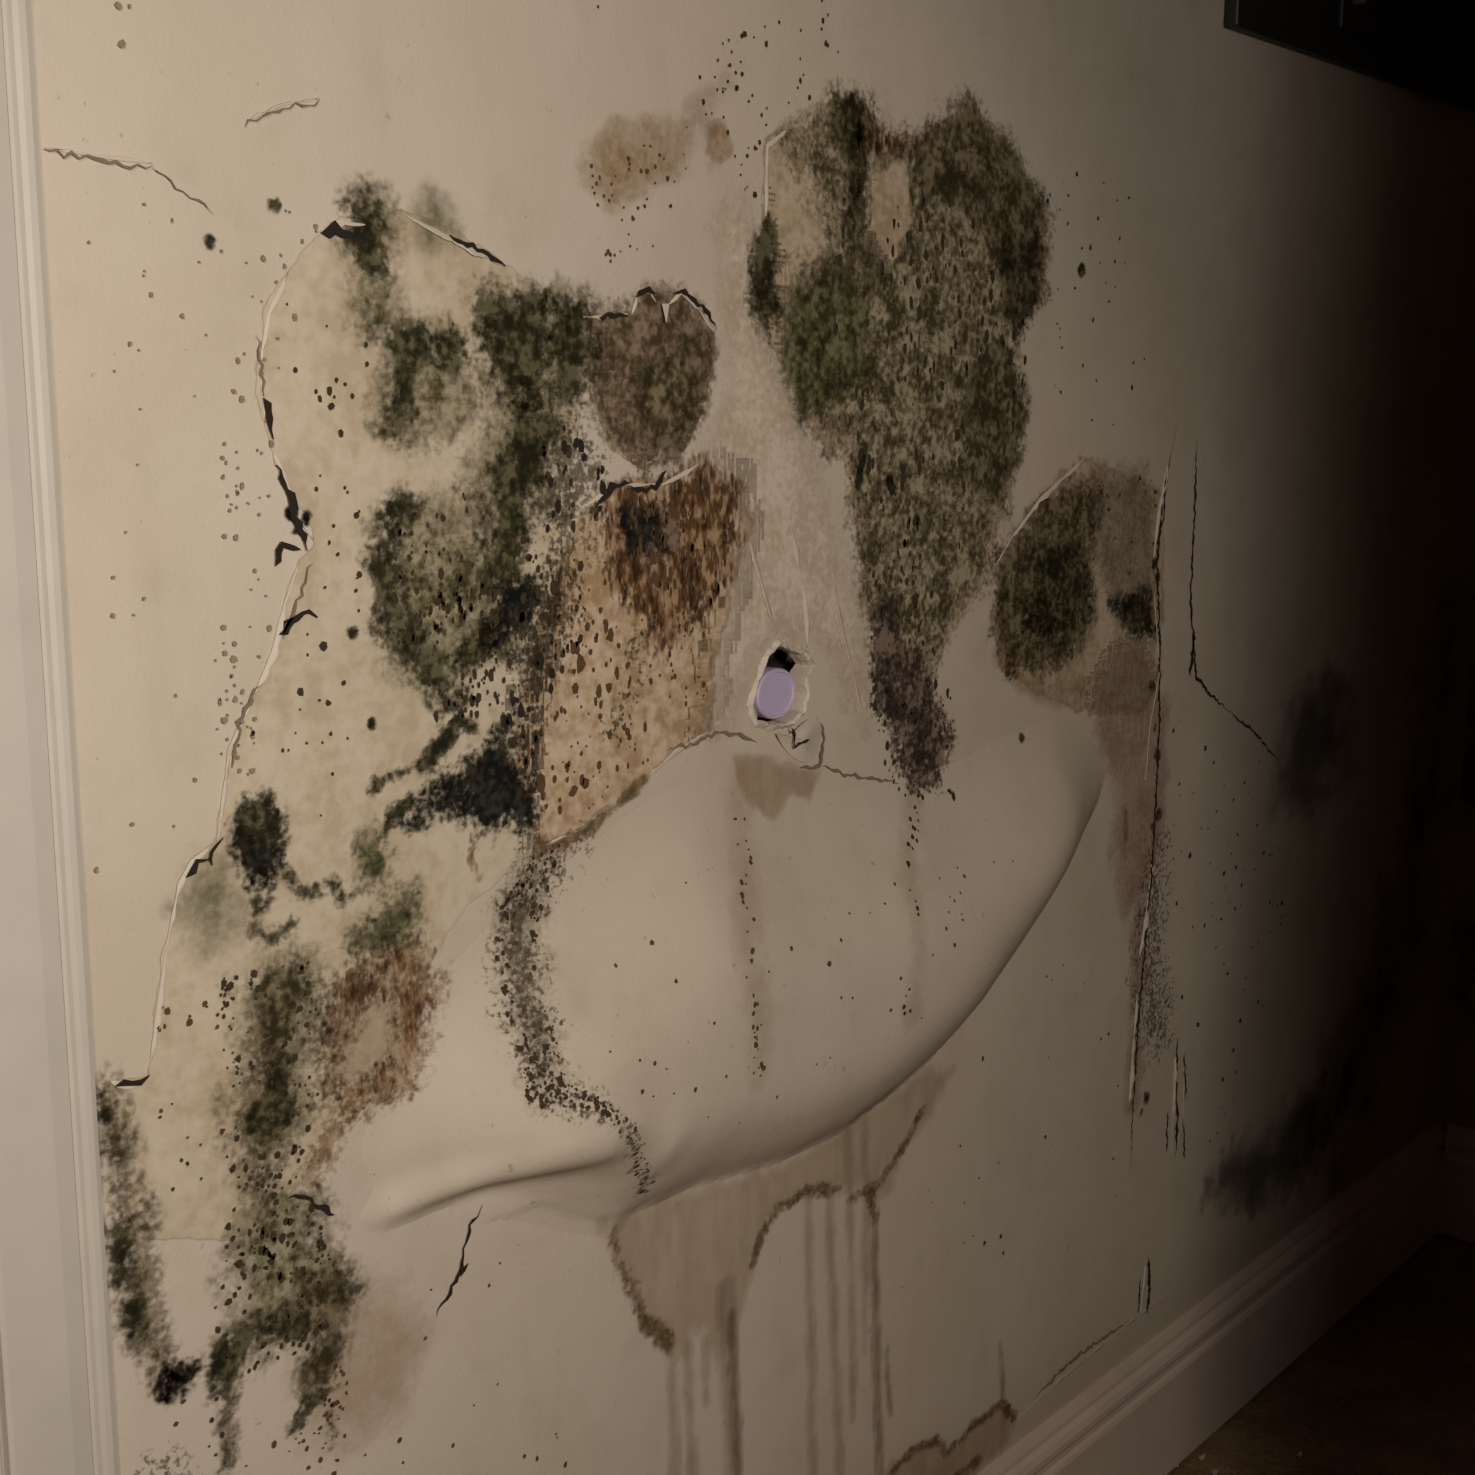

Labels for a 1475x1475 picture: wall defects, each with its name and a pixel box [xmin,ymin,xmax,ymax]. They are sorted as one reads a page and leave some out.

crack [44,148,209,209]
water stain [97,178,747,1475]
crack [437,1205,483,1314]
peeling [108,97,1164,1241]
water stain [750,1106,925,1268]
water stain [699,20,1194,1109]
water stain [891,1400,1016,1475]
crack [1128,429,1278,1165]